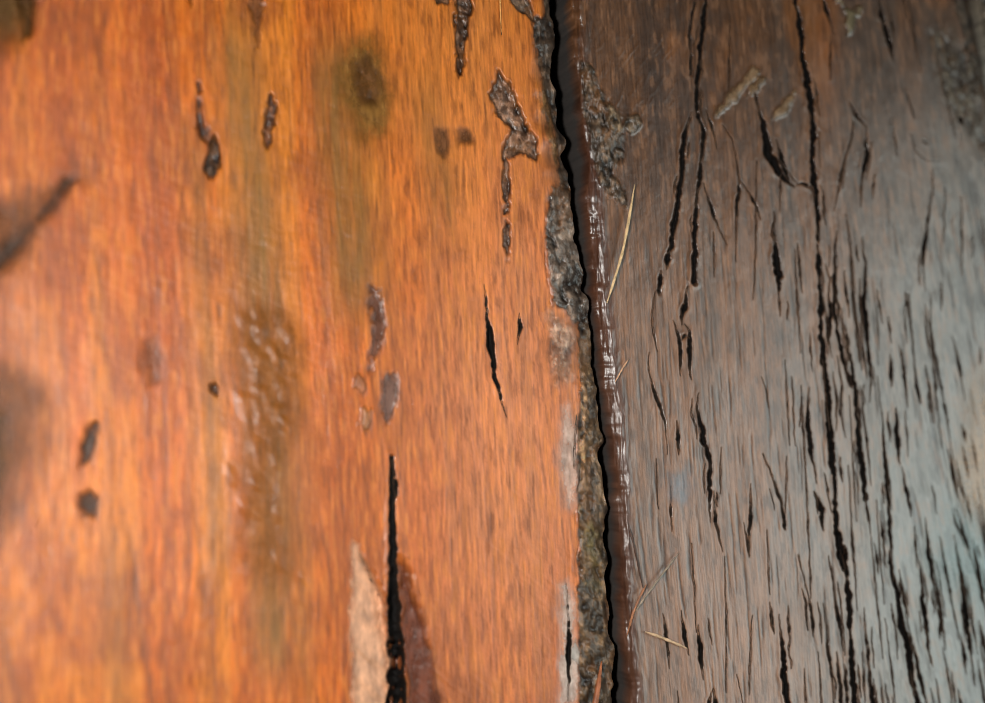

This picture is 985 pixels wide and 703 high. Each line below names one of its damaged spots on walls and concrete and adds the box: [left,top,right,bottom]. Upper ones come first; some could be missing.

water stain [0,370,39,519]
crack [484,285,523,417]
crack [648,0,985,703]
crack [358,456,407,703]